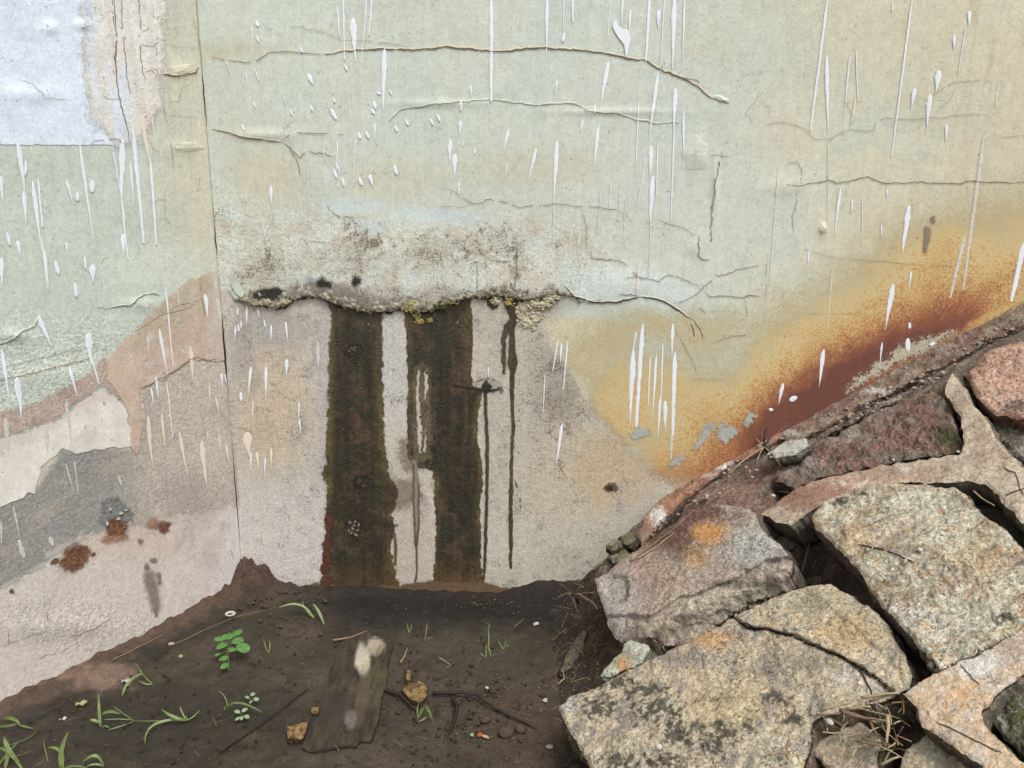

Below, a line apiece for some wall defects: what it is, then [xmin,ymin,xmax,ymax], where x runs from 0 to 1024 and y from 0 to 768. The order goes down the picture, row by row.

peeling [79,0,171,148]
spalling [98,498,132,542]
peeling [0,271,580,507]
water stain [311,300,510,593]
water stain [487,298,518,569]
crack [91,0,1024,559]
rust [568,184,1024,488]